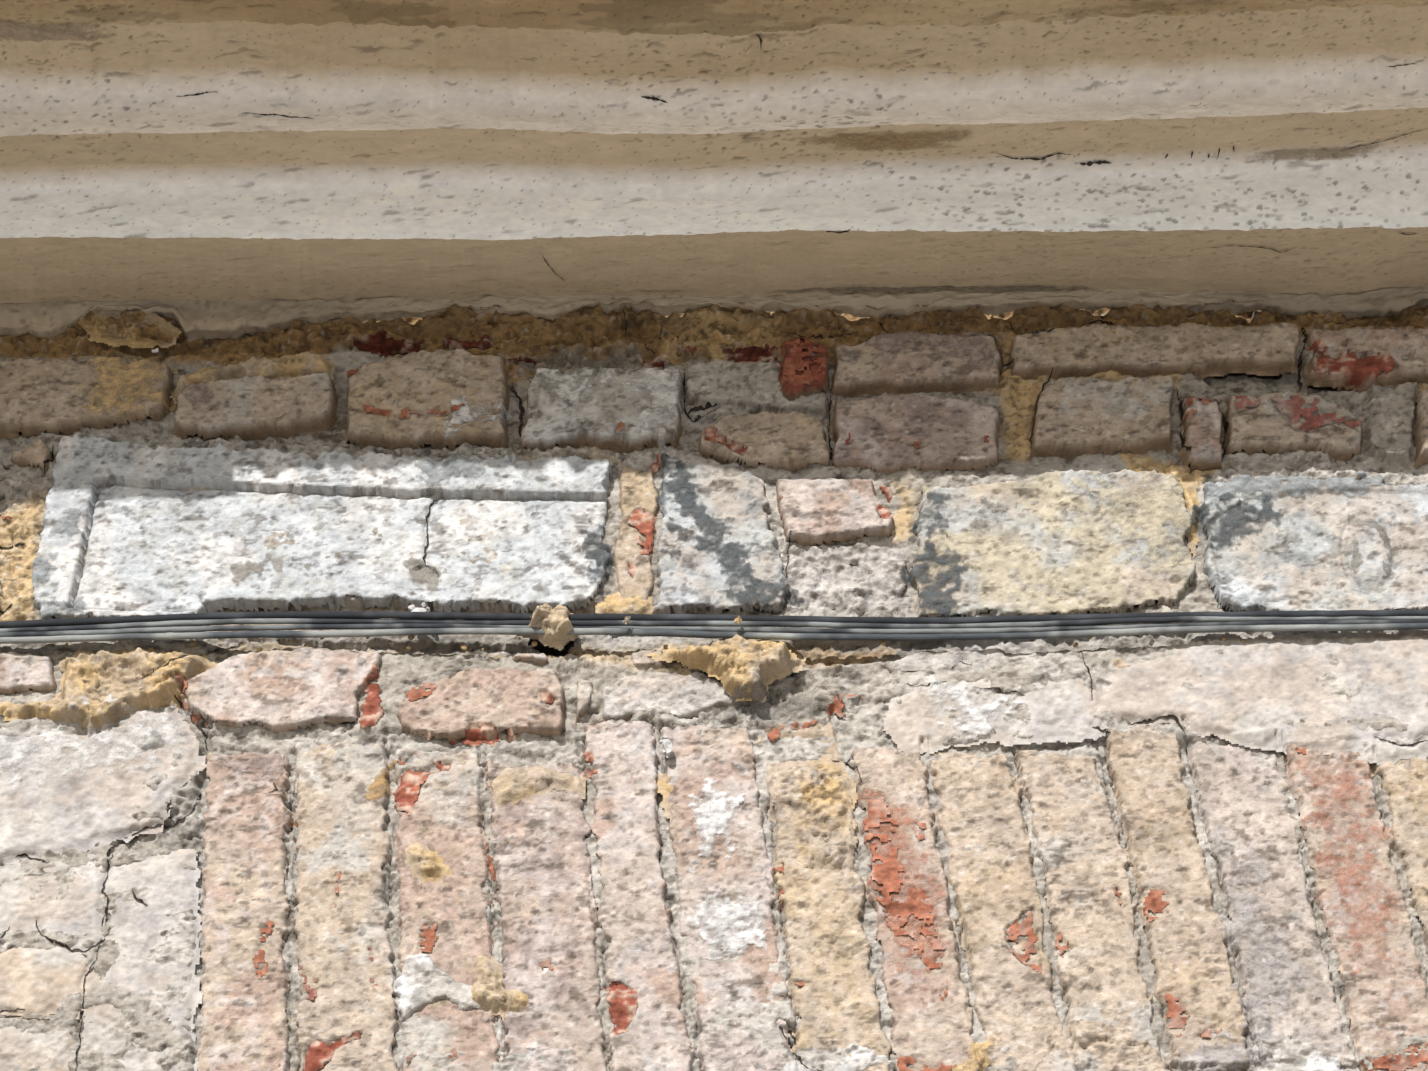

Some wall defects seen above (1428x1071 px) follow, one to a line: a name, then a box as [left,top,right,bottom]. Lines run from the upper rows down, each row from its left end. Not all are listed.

spalling [346,330,546,378]
crack [418,500,438,574]
spalling [359,664,385,730]
crack [1080,651,1187,736]
spalling [424,722,519,747]
crack [1374,736,1428,746]
spalling [393,757,450,815]
crack [0,793,201,1071]
spalling [863,790,946,974]
spalling [1142,888,1170,922]
spalling [603,981,639,1037]
spalling [303,1030,364,1071]